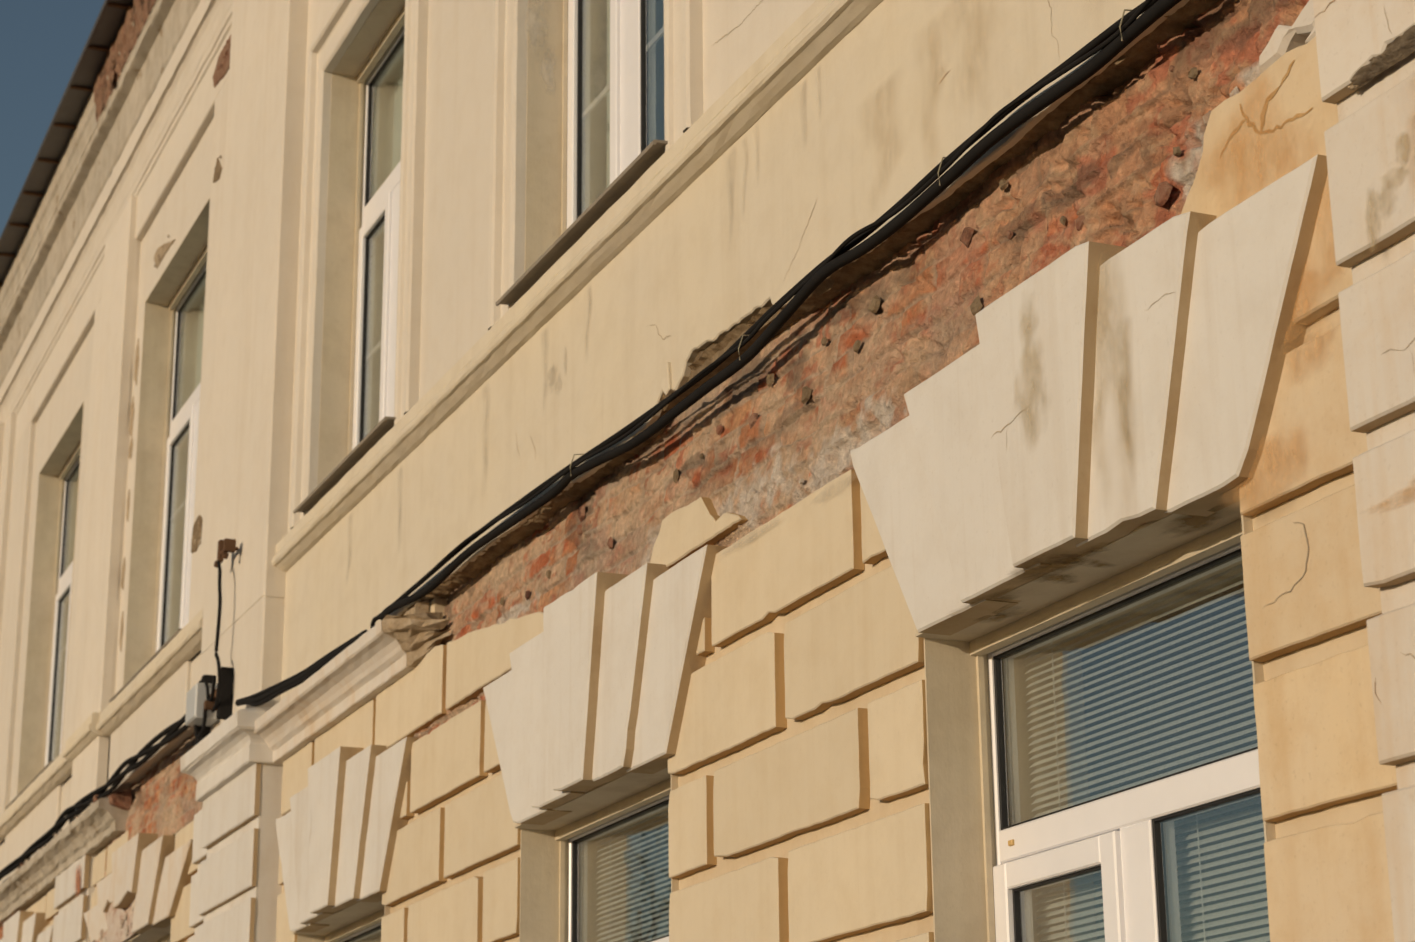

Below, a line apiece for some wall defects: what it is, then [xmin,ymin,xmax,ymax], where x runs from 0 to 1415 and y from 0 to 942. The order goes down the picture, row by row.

flaking render [1347,25,1415,90]
flaking render [440,0,1316,645]
crack [1262,522,1309,609]
flaking render [414,691,486,738]
flaking render [75,734,203,877]